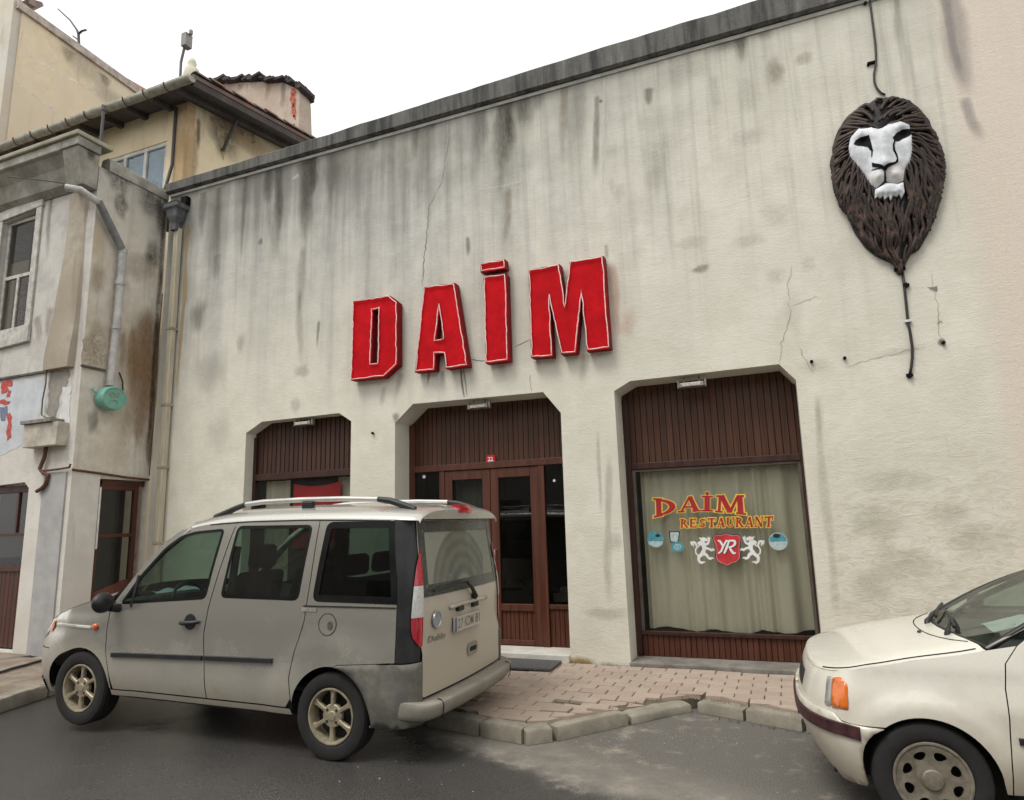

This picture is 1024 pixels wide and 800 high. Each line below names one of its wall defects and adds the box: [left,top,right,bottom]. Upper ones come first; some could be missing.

damp [499,93,529,153]
crack [422,123,449,280]
crack [779,267,815,373]
crack [847,280,942,367]
peeling [0,370,72,455]